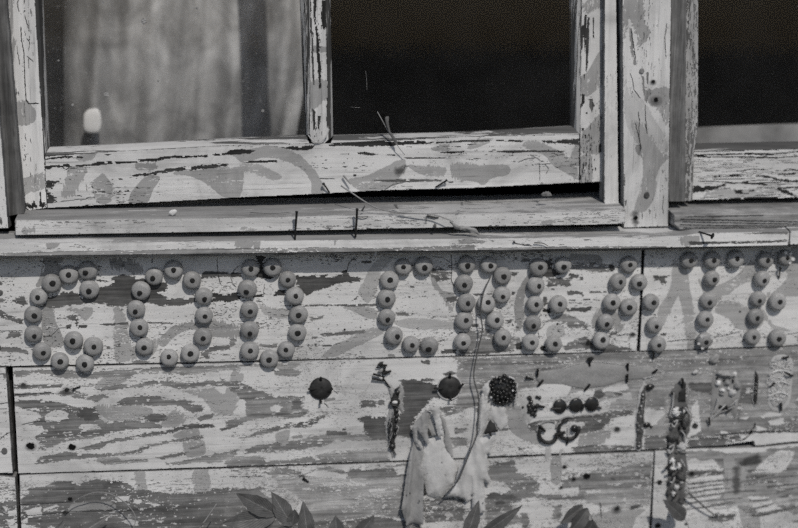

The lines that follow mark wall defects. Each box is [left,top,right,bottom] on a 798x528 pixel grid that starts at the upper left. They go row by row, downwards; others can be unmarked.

peeling [310,0,326,89]
peeling [581,14,594,80]
peeling [25,180,60,210]
peeling [45,149,277,178]
peeling [329,128,586,164]
peeling [693,168,798,199]
peeling [0,245,476,280]
peeling [40,274,197,329]
peeling [211,293,243,302]
peeling [273,269,377,322]
peeling [397,258,798,528]
peeling [0,338,467,528]